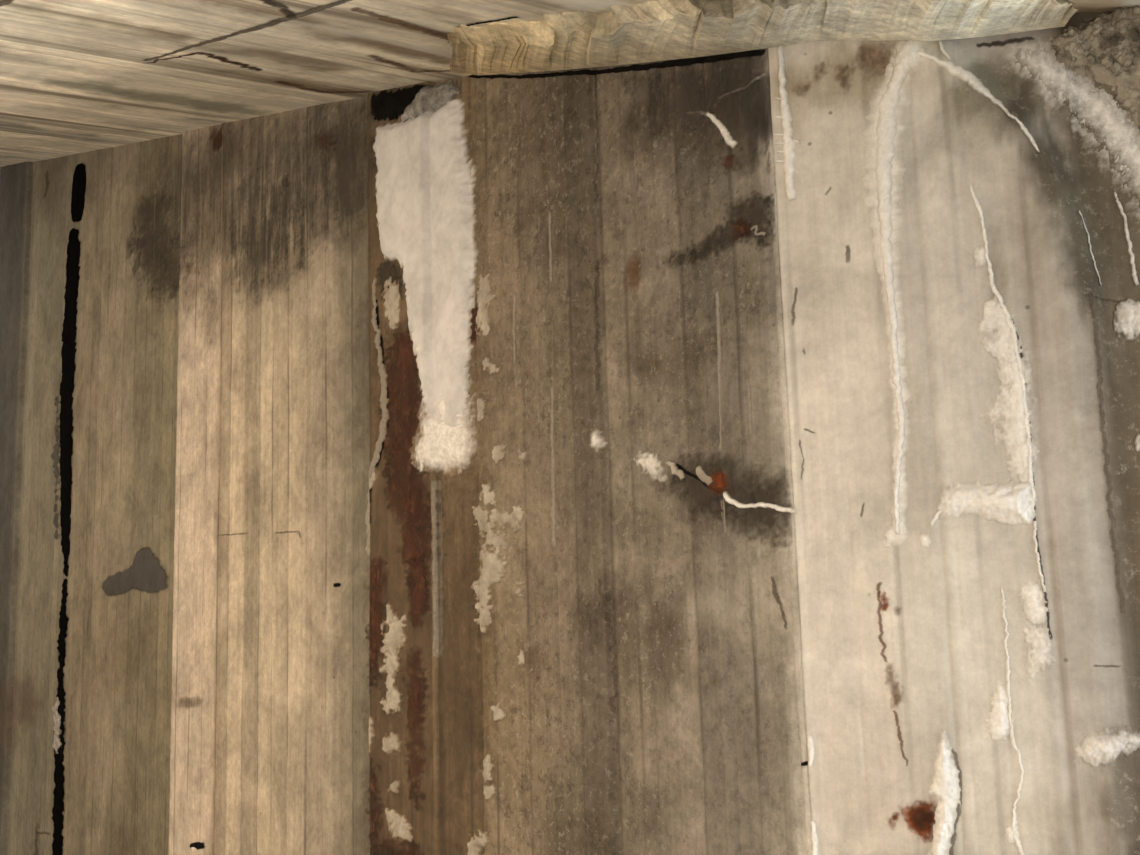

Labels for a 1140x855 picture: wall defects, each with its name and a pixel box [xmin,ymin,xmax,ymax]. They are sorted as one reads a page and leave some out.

crack [261,0,296,18]
leakage [1000,34,1140,234]
rust [669,195,775,266]
leakage [127,79,482,658]
leakage [861,40,1038,549]
leakage [1112,296,1140,341]
rust [365,330,481,855]
rust [889,802,936,841]
leakage [925,730,962,855]
leakage [1074,725,1140,767]